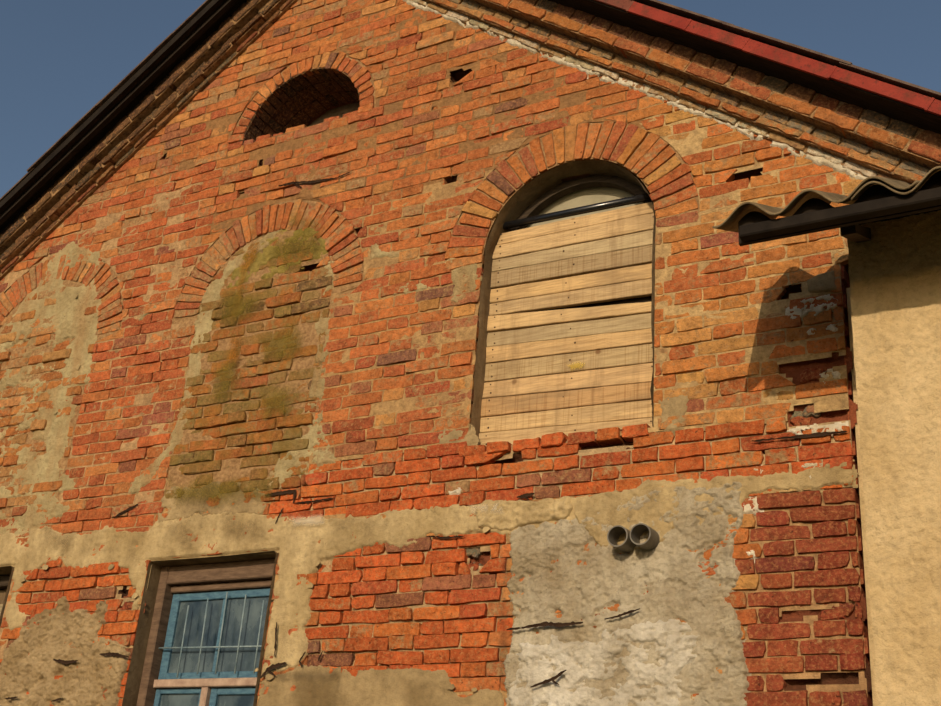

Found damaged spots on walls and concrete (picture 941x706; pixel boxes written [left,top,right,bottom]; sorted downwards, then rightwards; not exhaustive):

spalling [781,284,802,300]
spalling [779,347,853,385]
spalling [787,400,858,432]
peeling [0,241,523,706]
peeling [630,460,859,526]